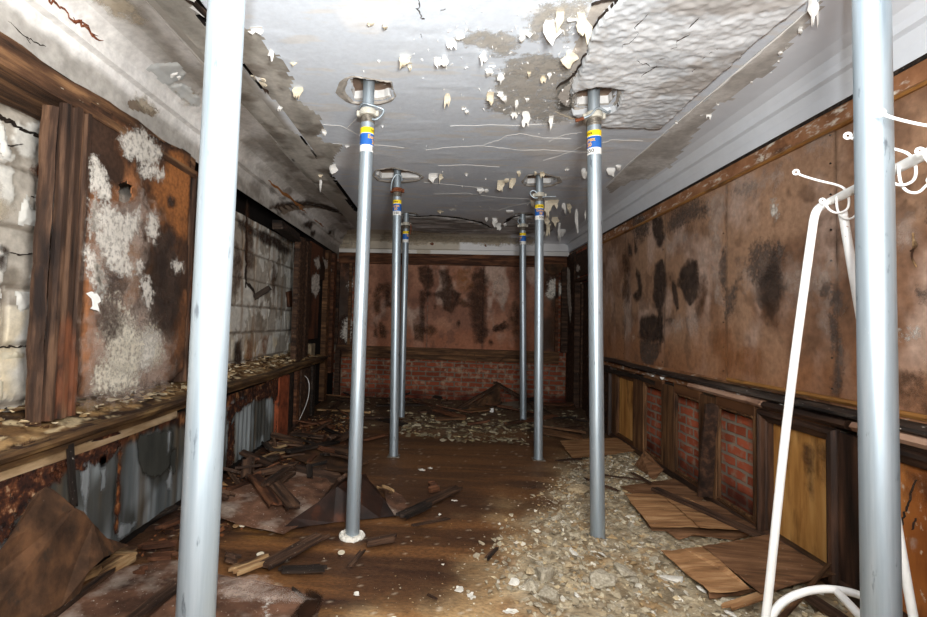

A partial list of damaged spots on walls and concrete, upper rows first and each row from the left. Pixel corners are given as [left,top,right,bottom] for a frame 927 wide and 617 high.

crack [0,114,39,147]
corrosion [48,0,104,41]
leakage [117,130,165,182]
peeling [241,27,349,199]
peeling [479,50,530,127]
peeling [543,1,613,110]
peeling [606,0,825,193]
peeling [485,200,586,241]
mould [84,156,183,397]
leakage [414,266,520,344]
leakage [623,196,737,365]
corrosion [0,431,123,547]